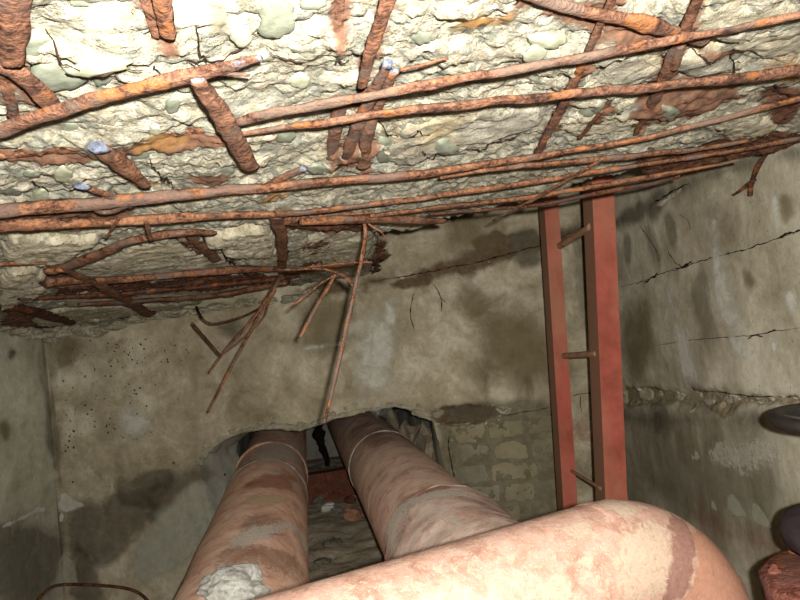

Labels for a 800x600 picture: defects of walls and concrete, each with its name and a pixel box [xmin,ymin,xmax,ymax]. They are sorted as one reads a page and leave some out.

corrosion [458,17,509,29]
corrosion [631,73,800,174]
corrosion [190,174,228,186]
corrosion [7,208,133,232]
corrosion [108,223,373,299]
corrosion [371,240,391,274]
spalling [0,0,800,466]
crack [622,226,800,287]
corrosion [2,311,56,329]
crack [654,328,795,346]
flaking render [432,402,558,521]
leakage [0,471,202,600]